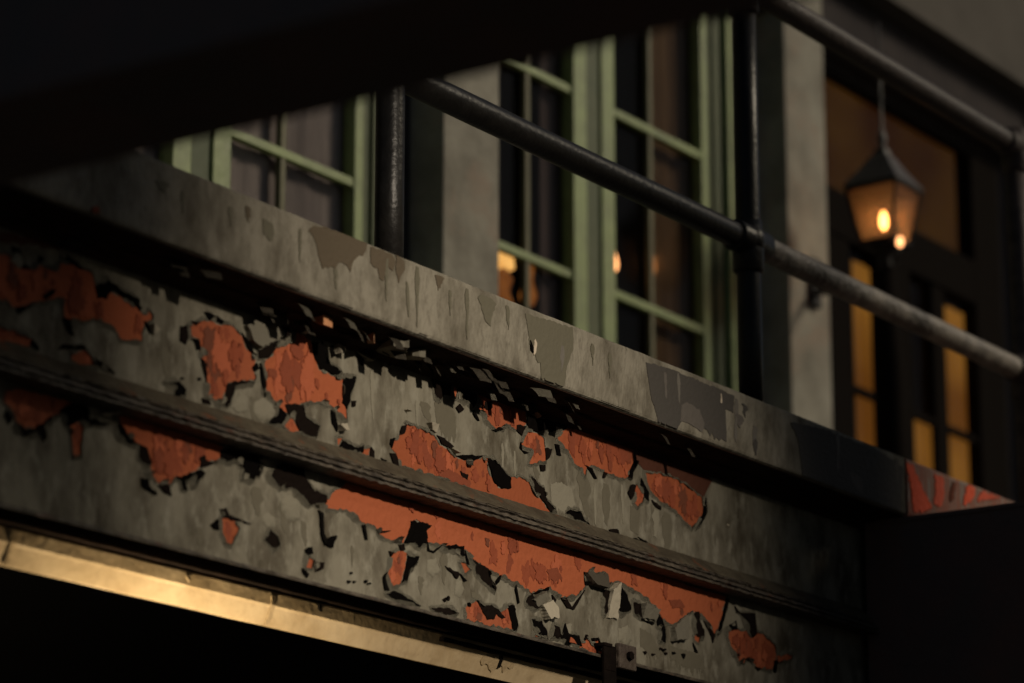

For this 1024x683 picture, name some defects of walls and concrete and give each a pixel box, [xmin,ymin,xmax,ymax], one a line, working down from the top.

spalling [95,280,160,336]
peeling [164,302,712,527]
peeling [906,462,945,513]
peeling [963,485,1000,506]
peeling [4,403,758,659]